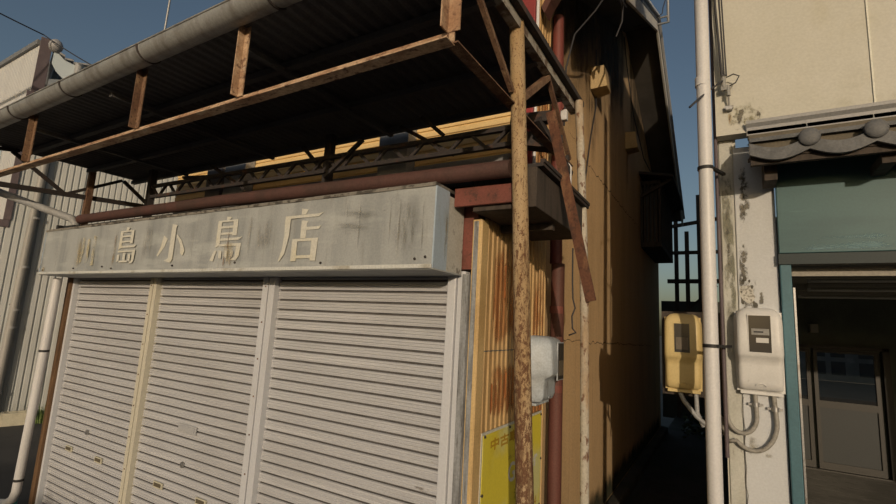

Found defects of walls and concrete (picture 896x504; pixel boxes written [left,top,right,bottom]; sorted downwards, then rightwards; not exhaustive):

spalling [739,276,758,308]
rust [490,367,514,414]